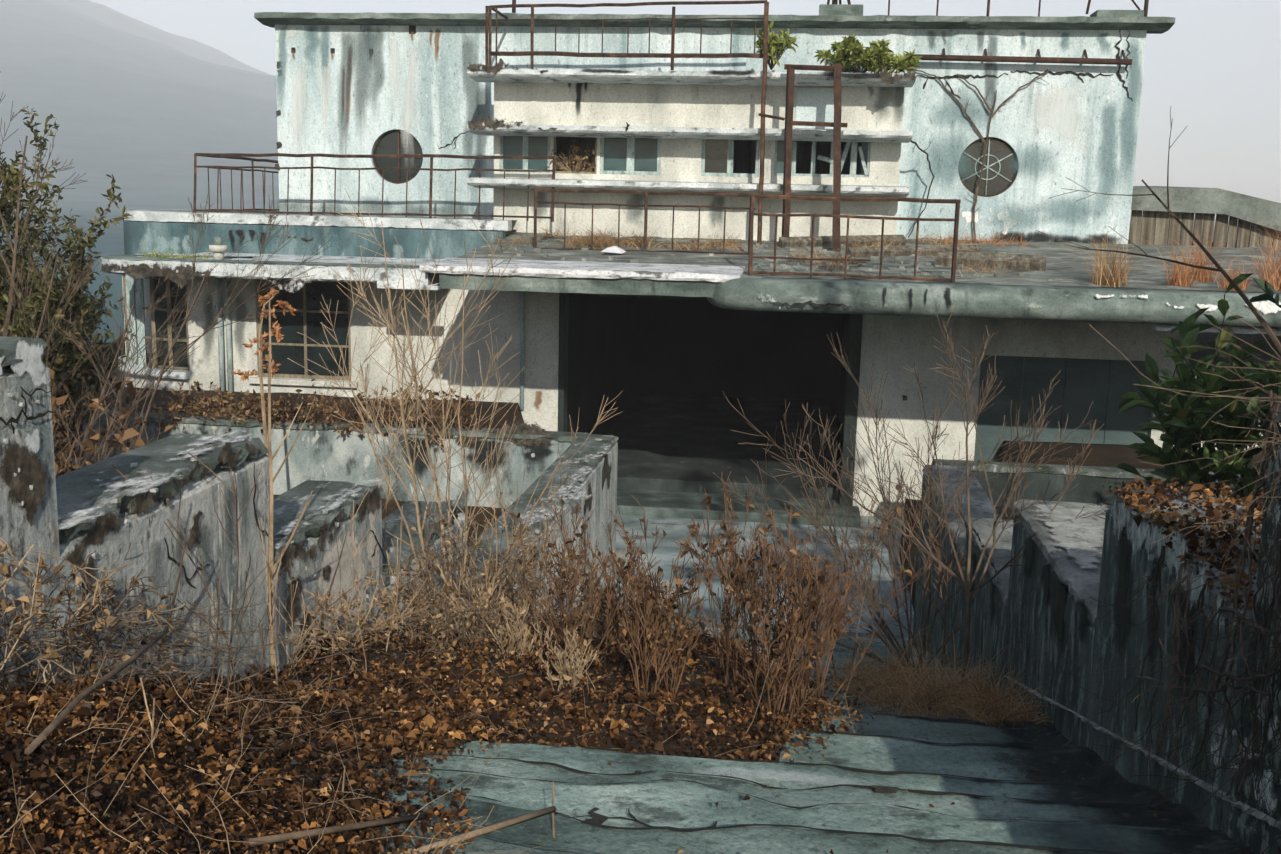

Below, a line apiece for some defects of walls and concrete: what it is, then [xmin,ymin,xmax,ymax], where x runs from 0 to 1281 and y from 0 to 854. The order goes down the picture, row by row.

water stain [995,232,1116,244]
flaking render [0,340,50,407]
crack [0,386,53,434]
water stain [1115,534,1196,684]
crack [556,807,655,827]